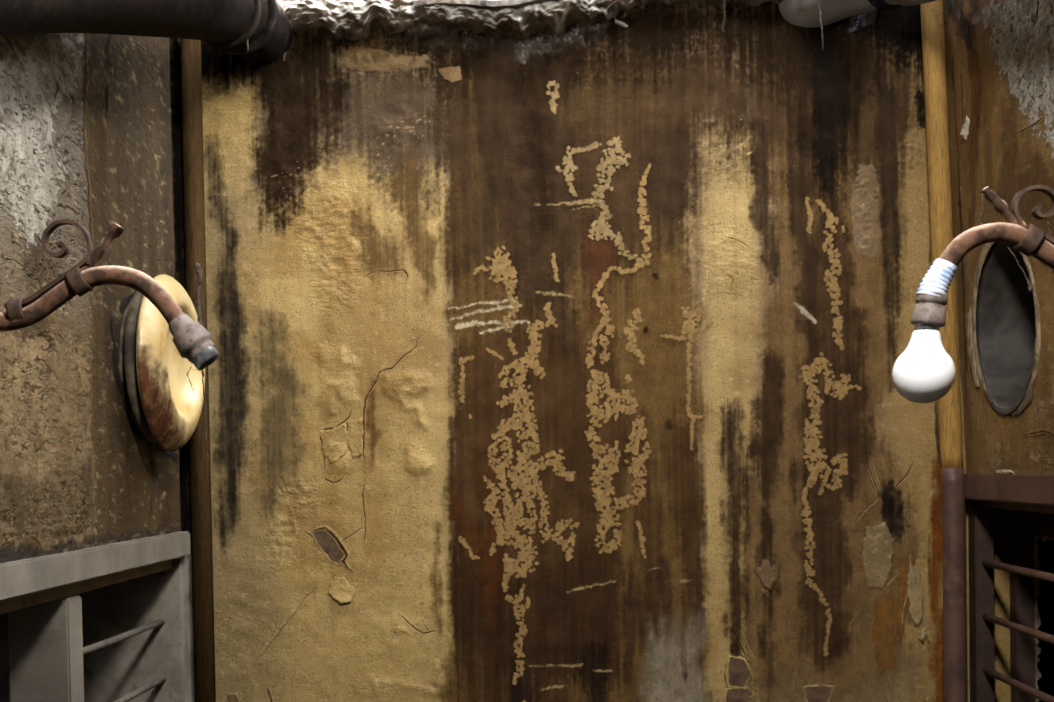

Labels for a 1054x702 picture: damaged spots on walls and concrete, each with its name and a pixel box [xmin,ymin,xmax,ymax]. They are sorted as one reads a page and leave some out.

peeling [981,0,1054,165]
peeling [0,33,85,248]
leakage [289,21,923,702]
crack [317,329,430,548]
spalling [304,525,356,604]
crack [397,612,440,636]
peeling [862,522,896,590]
peeling [907,565,927,642]
spalling [723,655,756,702]